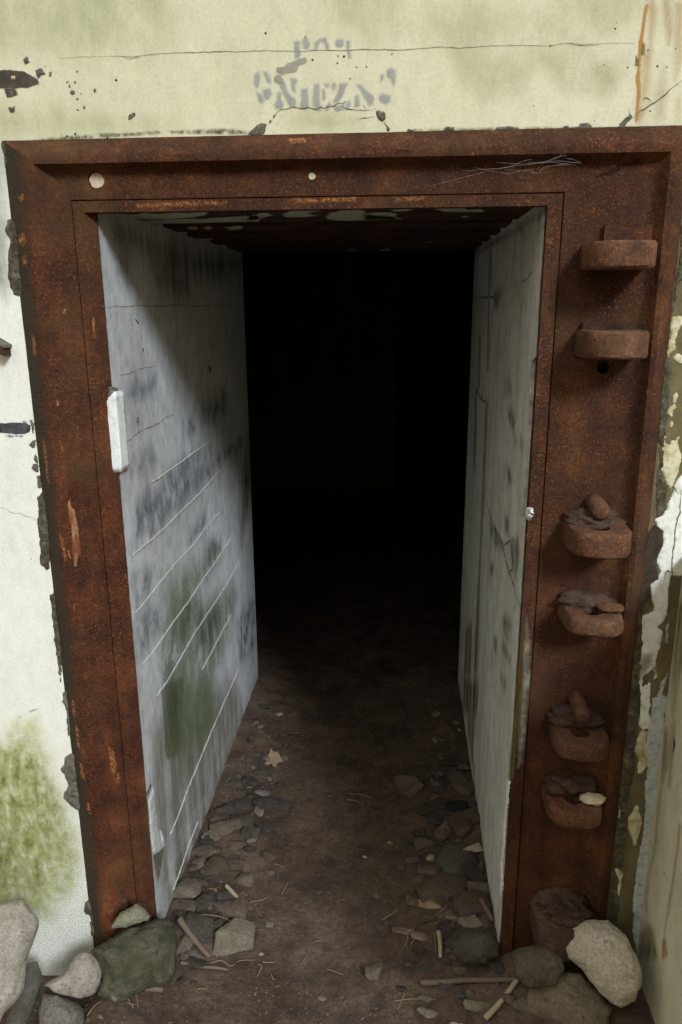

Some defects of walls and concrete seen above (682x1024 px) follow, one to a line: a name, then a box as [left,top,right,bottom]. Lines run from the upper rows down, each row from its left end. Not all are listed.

spalling [0,56,52,112]
crack [271,101,369,122]
crack [69,43,600,59]
rust [636,5,648,121]
spalling [29,420,50,570]
rust [60,500,81,567]
water stain [137,474,202,532]
spalling [606,213,682,951]
rust [463,580,480,761]
spalling [61,753,80,811]
water stain [157,692,237,890]
rust [542,770,597,797]